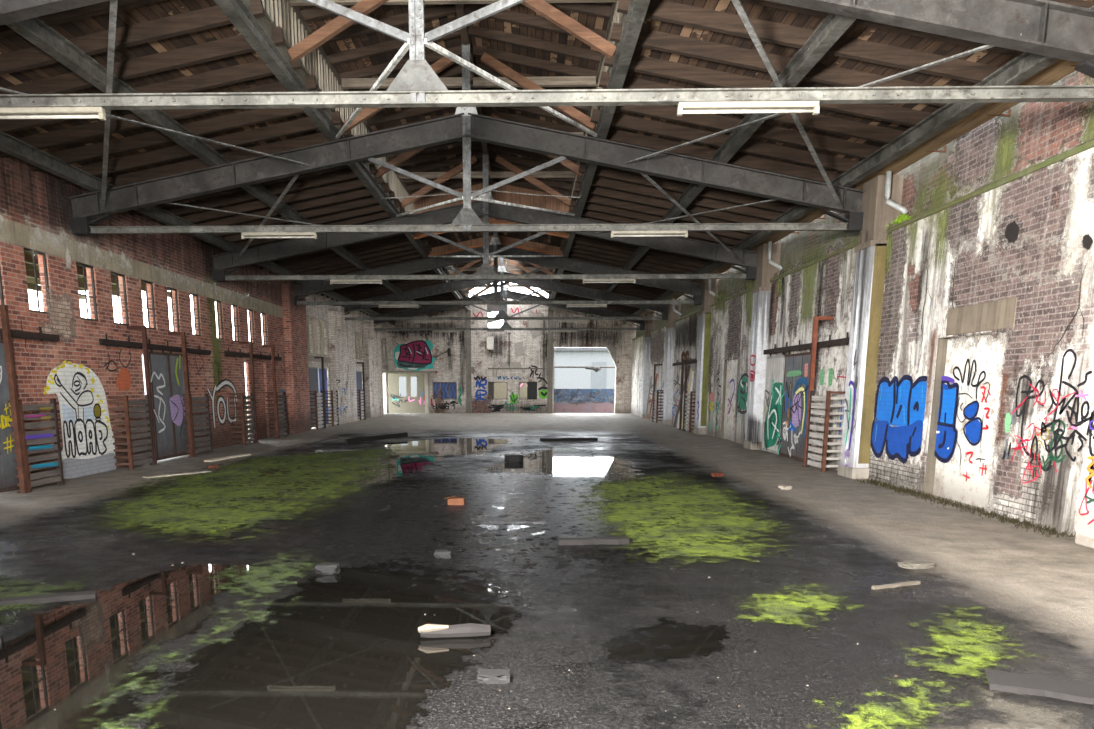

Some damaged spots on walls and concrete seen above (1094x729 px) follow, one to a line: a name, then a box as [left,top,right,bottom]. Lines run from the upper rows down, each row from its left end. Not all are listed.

flaking render [1052,71,1094,85]
flaking render [726,283,744,360]
flaking render [770,259,803,339]
flaking render [820,240,844,337]
flaking render [869,102,1094,524]